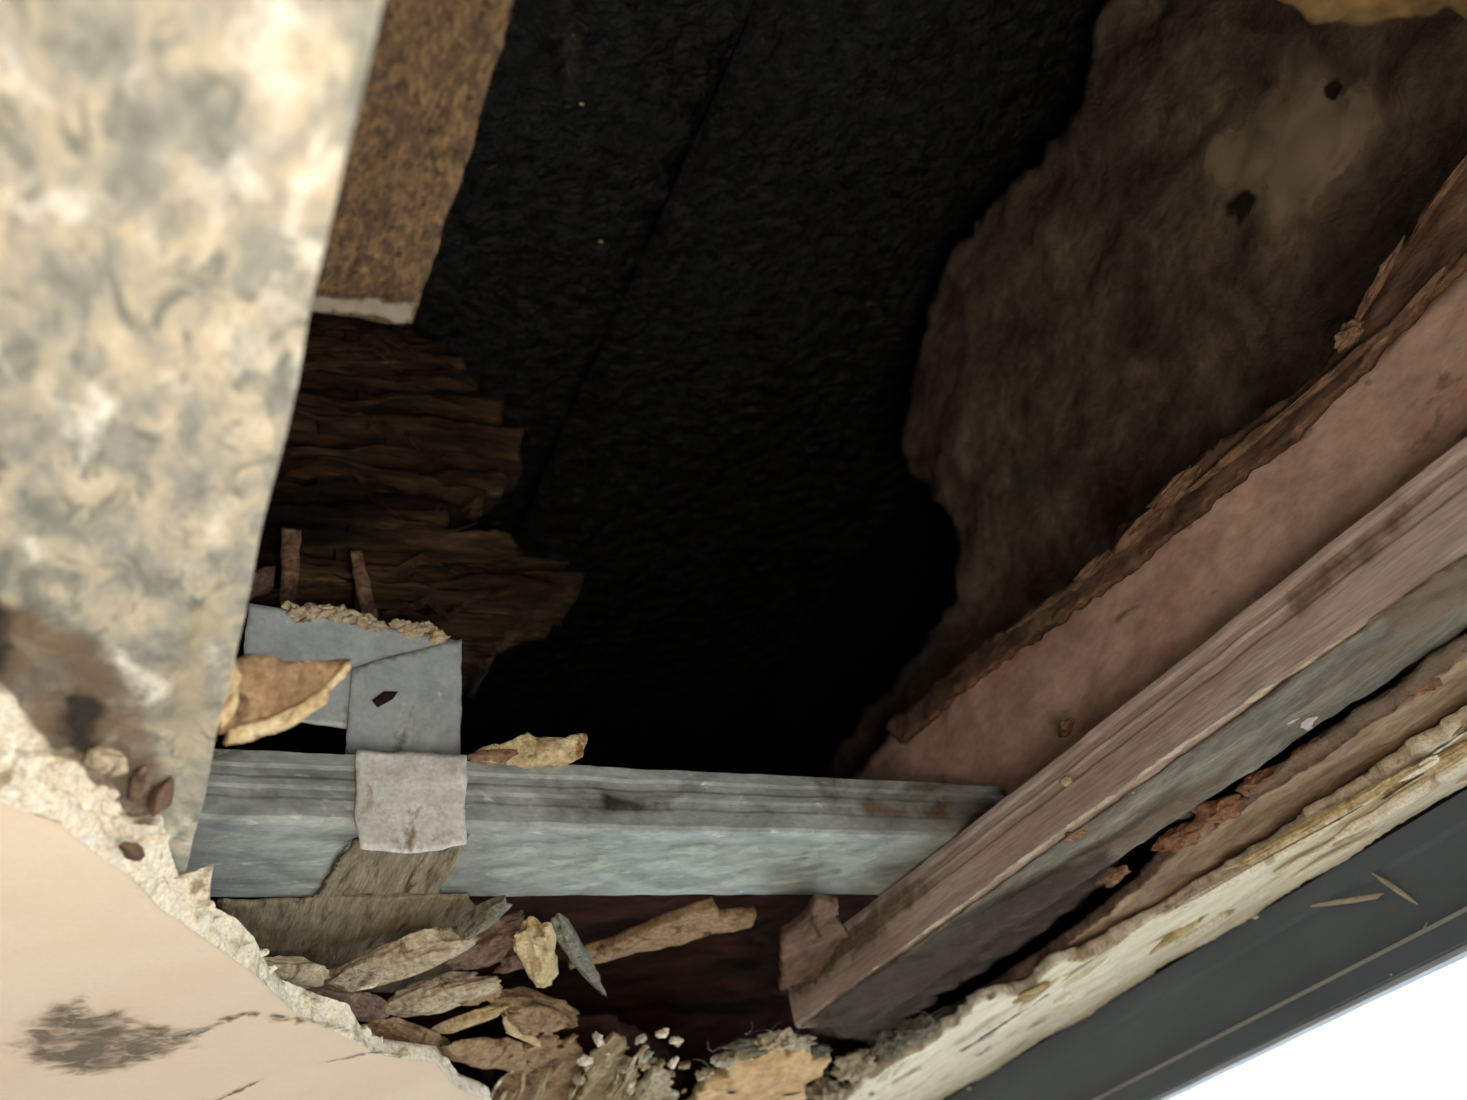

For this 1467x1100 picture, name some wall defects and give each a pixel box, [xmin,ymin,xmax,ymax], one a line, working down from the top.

water stain [0,608,160,826]
spalling [223,661,351,746]
flaking render [0,689,492,1100]
water stain [31,1001,210,1071]
water stain [225,1013,347,1031]
flaking render [502,1014,541,1047]